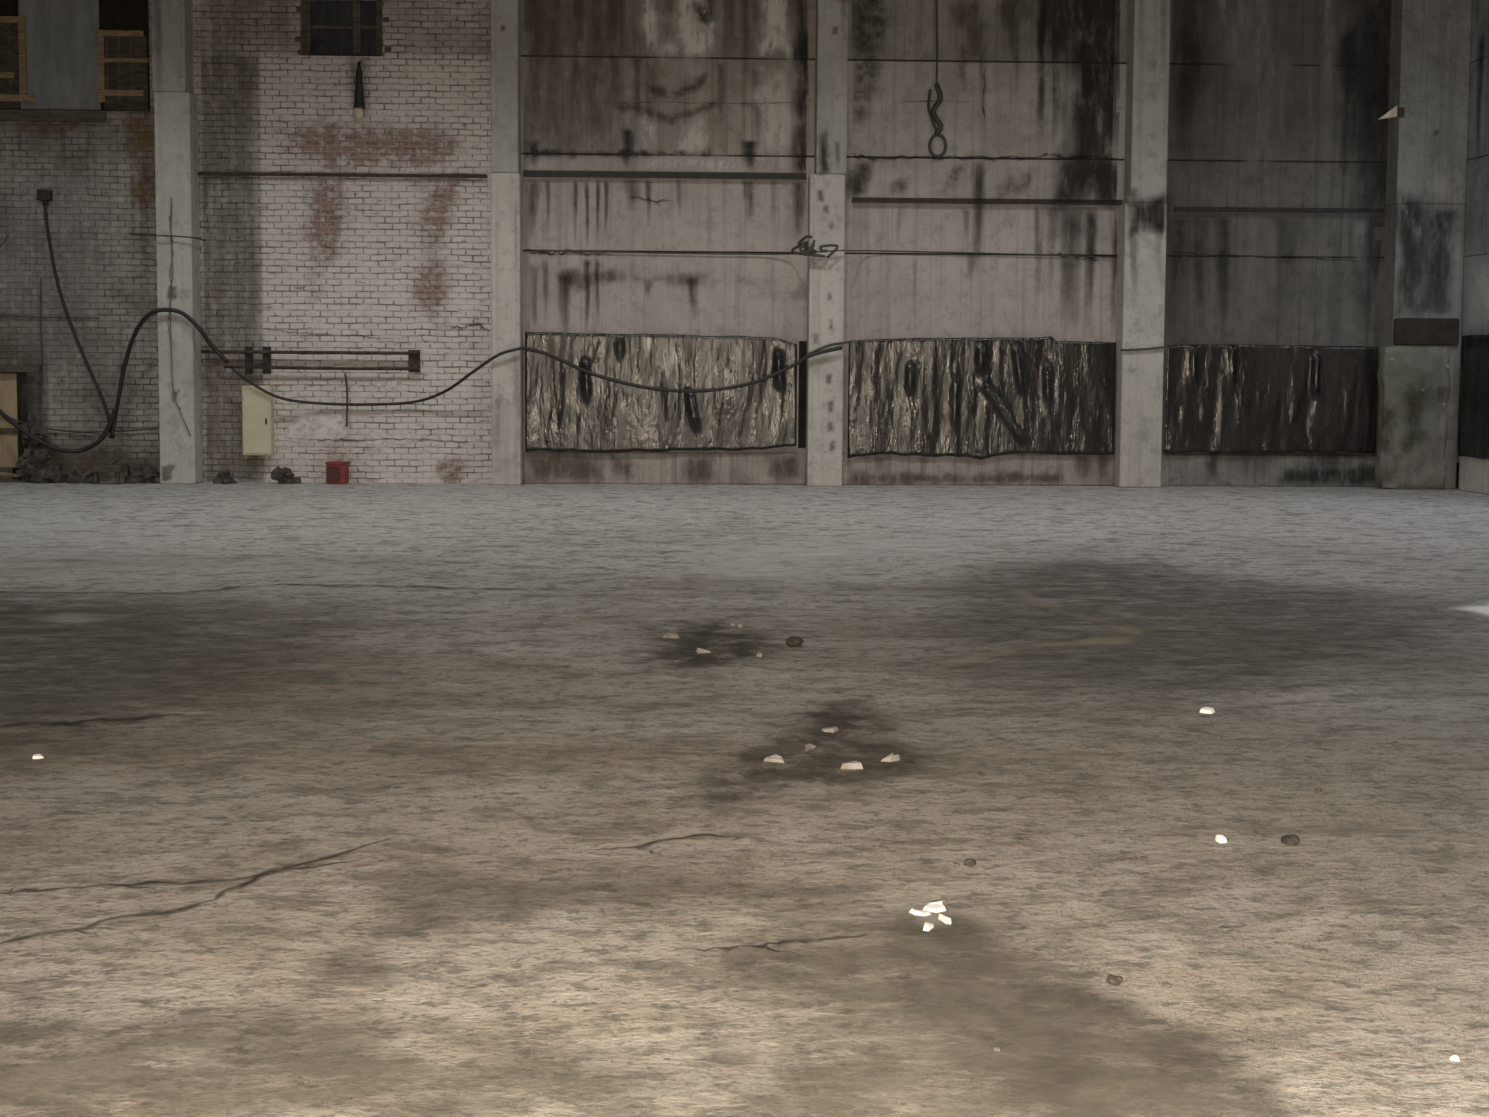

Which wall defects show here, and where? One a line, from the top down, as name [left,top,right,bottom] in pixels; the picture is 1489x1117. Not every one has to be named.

damp [574,184,608,223]
damp [1064,212,1096,276]
damp [545,261,616,306]
damp [668,276,698,303]
crack [0,837,395,944]